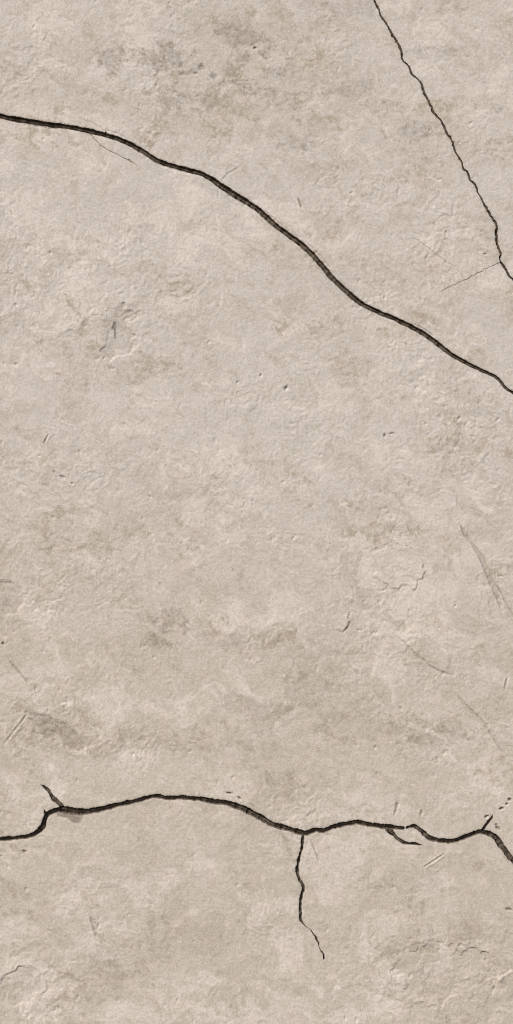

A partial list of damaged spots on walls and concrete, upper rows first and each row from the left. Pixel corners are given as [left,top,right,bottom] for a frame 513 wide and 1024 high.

crack [0,113,513,394]
crack [373,0,513,291]
crack [0,785,513,959]